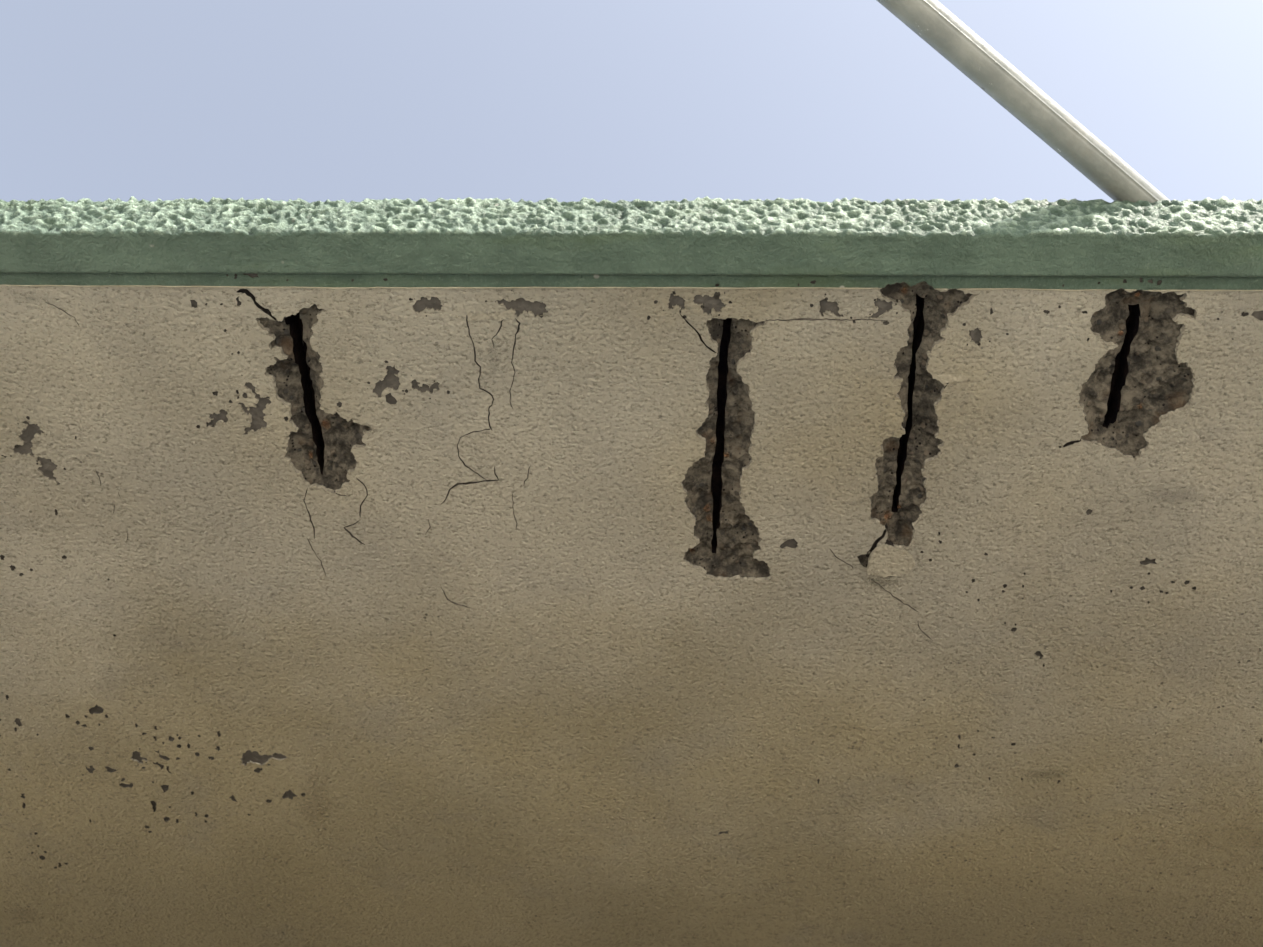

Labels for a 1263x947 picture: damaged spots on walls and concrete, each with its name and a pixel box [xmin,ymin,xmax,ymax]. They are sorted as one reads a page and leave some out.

peeling [1,416,66,485]
crack [237,289,279,322]
spalling [196,304,375,493]
crack [303,479,368,576]
crack [425,315,531,535]
spalling [647,283,772,581]
peeling [780,539,798,548]
spalling [798,280,990,561]
spalling [1078,277,1197,461]
peeling [1241,311,1263,321]